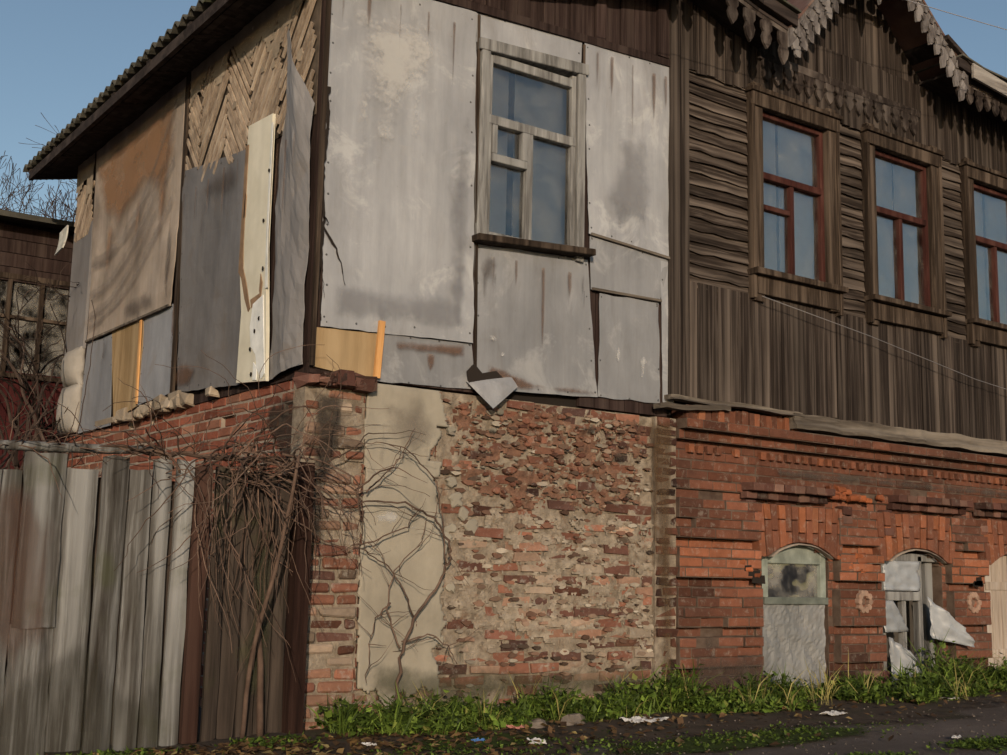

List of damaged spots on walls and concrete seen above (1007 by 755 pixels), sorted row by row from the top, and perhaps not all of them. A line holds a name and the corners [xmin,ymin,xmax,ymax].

water stain [102,114,171,214]
flaking render [356,383,655,709]